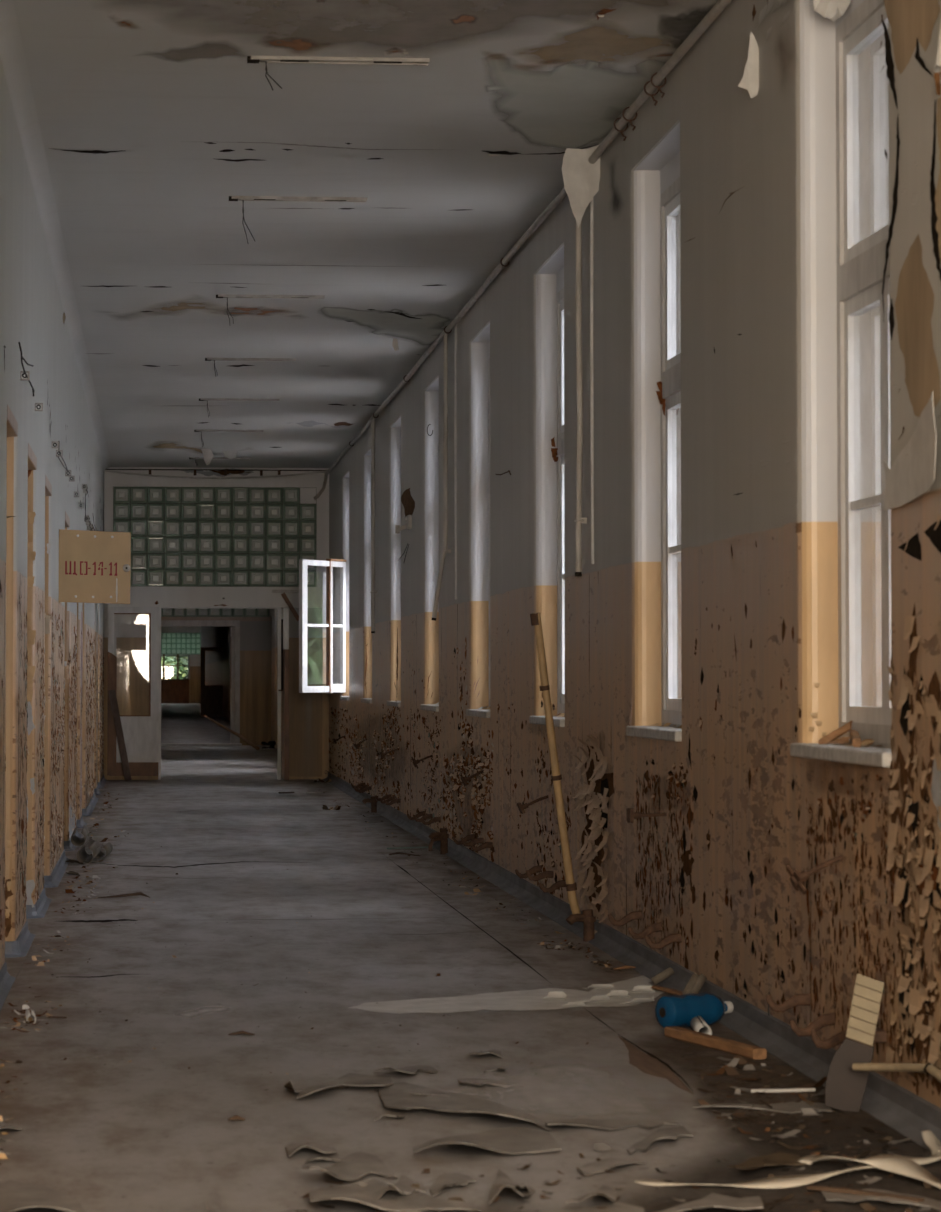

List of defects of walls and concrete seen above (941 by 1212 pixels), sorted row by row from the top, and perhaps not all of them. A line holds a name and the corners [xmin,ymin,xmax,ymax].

flaking render [487,55,665,149]
flaking render [322,307,448,344]
peeling [27,501,36,560]
peeling [898,515,941,561]
peeling [0,576,106,940]
peeling [328,638,614,933]
peeling [635,758,770,969]
peeling [735,603,941,1096]